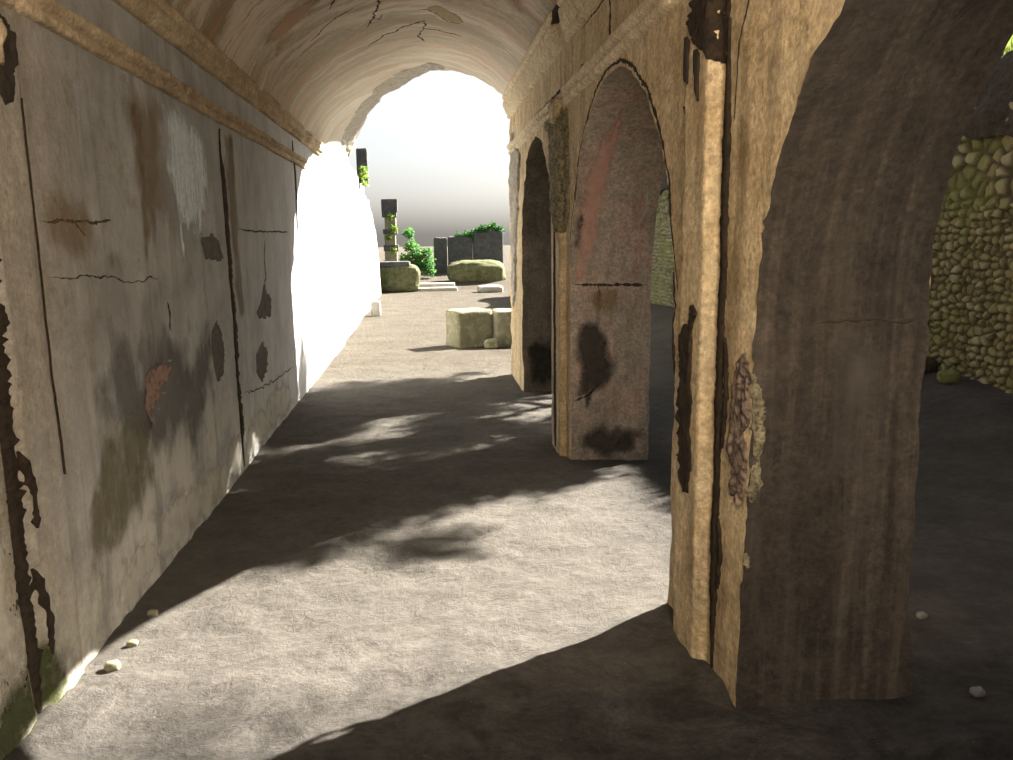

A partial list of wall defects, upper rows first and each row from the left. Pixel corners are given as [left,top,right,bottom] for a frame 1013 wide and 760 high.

crack [311,0,462,45]
water stain [104,340,212,444]
water stain [578,323,612,406]
water stain [583,427,639,454]
spalling [720,338,766,507]